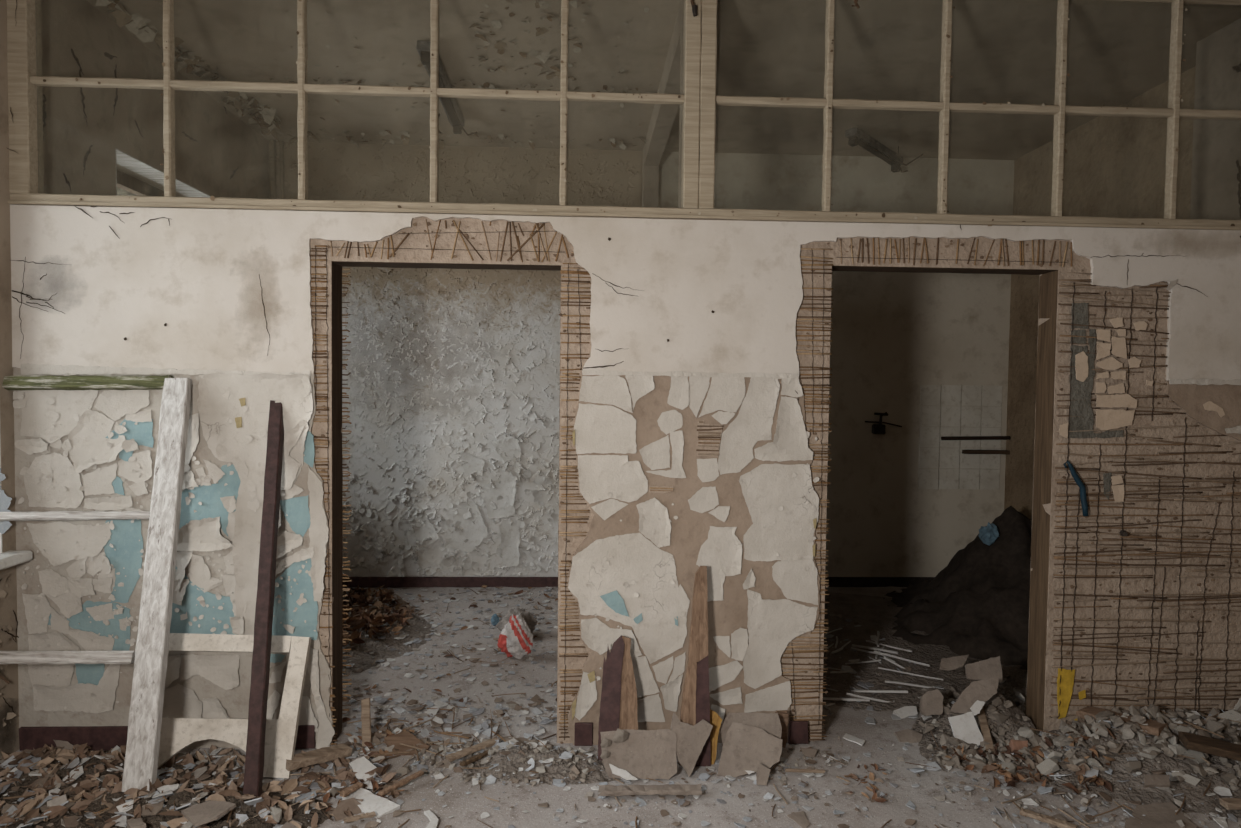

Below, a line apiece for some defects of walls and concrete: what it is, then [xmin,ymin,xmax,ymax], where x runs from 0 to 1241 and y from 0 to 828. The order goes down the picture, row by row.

peeling [95,0,658,212]
crack [12,257,68,359]
peeling [0,373,154,714]
peeling [162,219,1241,749]